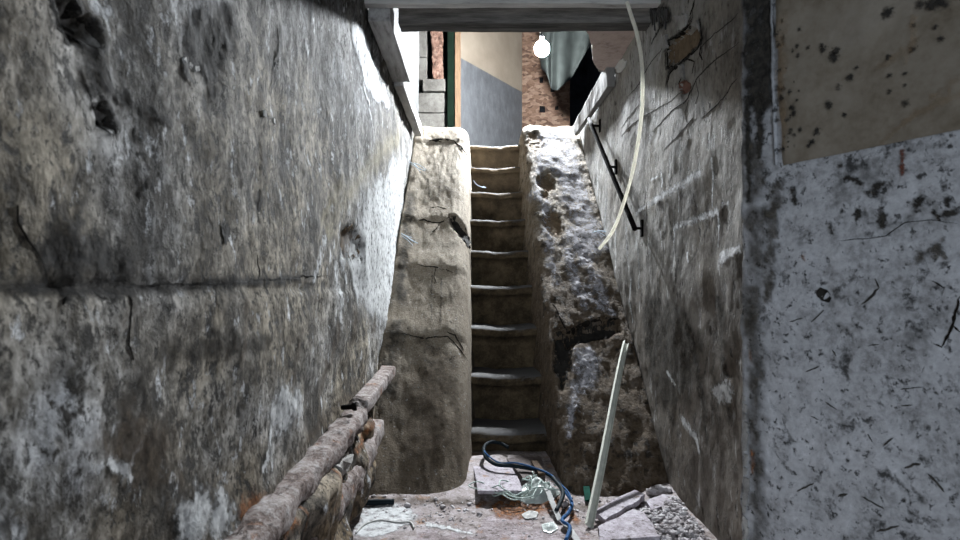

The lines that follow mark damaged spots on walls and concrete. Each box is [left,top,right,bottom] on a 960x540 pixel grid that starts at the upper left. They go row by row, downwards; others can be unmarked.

damp [917,0,948,10]
spalling [648,0,703,104]
crack [622,13,739,149]
crack [429,138,467,155]
crack [419,206,450,232]
crack [17,205,69,305]
damp [529,0,840,540]
crack [95,282,224,360]
crack [404,332,467,359]
crack [933,281,960,348]
crack [904,463,944,492]
crack [837,493,900,532]